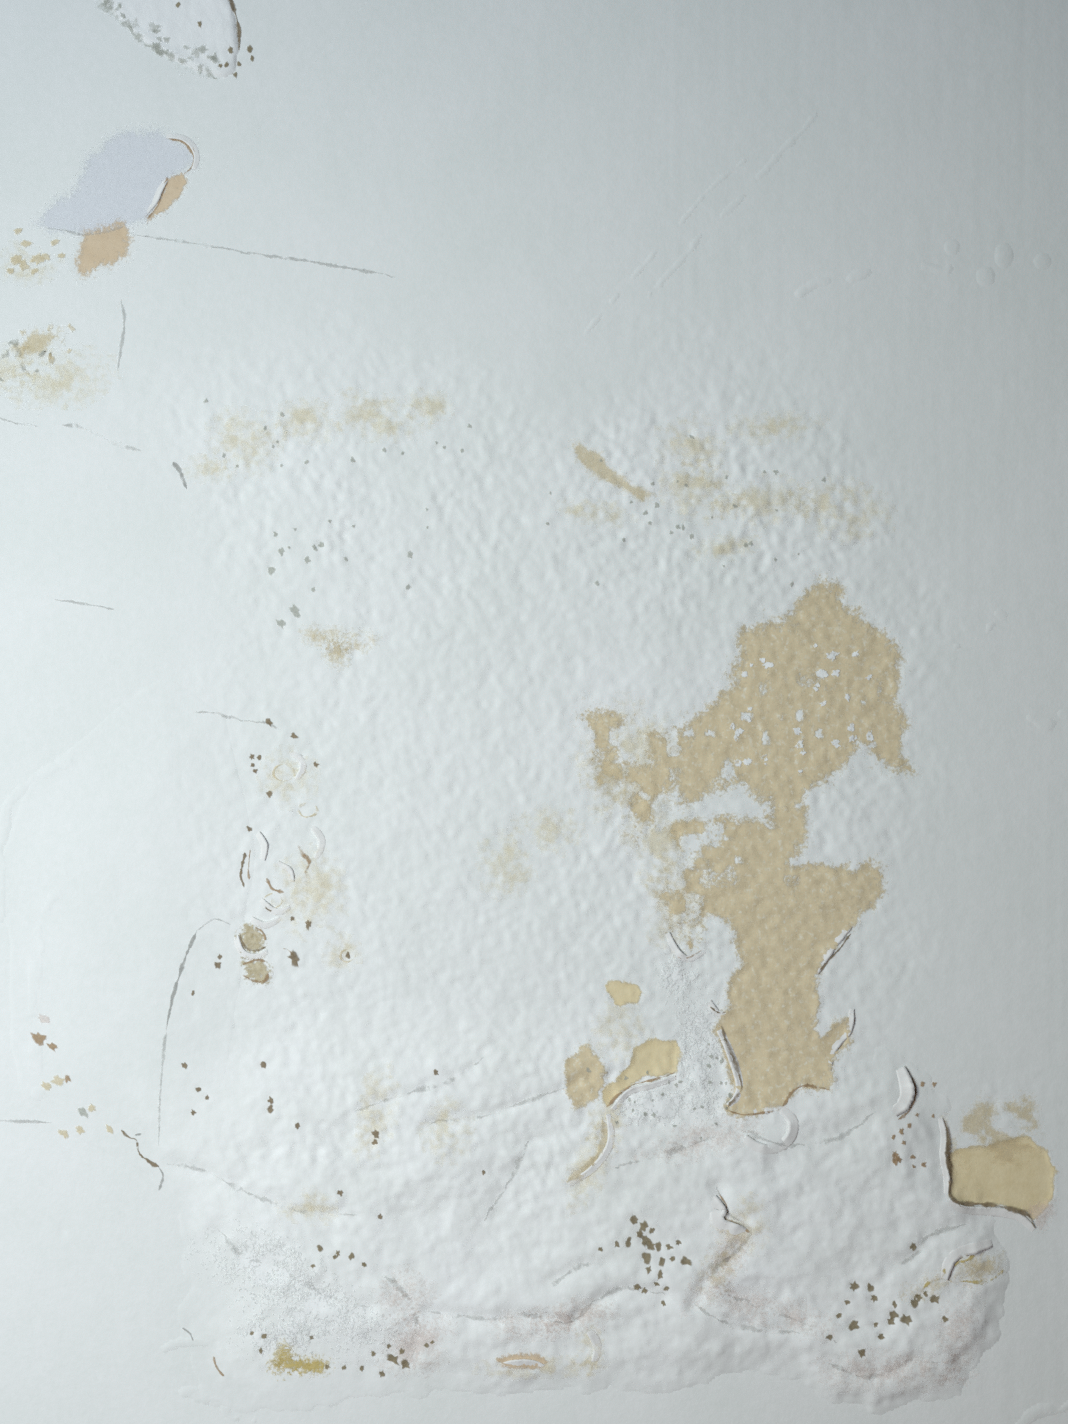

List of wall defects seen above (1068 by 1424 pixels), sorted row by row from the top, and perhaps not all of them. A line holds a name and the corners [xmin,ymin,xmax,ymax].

spalling [219,45,254,77]
peeling [40,132,200,276]
peeling [564,580,917,1187]
peeling [938,1100,1057,1232]
peeling [924,1239,1003,1288]